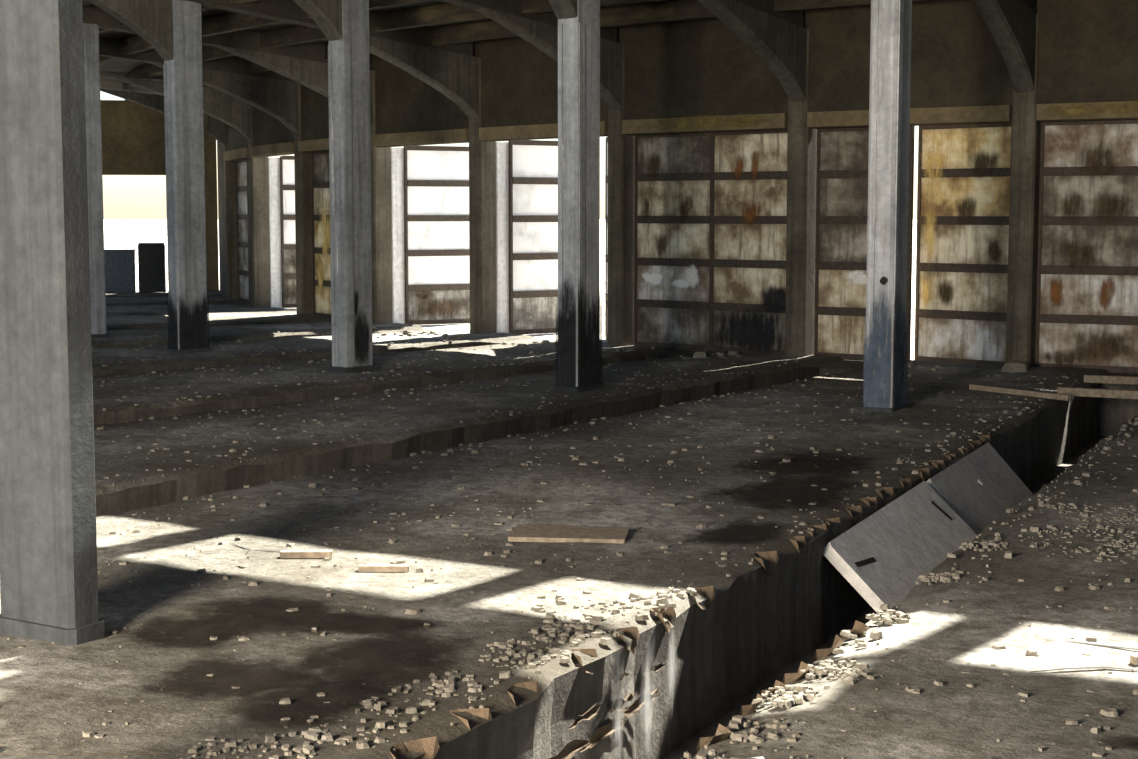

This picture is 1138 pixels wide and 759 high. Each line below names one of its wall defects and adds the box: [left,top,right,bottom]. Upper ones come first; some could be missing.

rust [925,209,935,257]
water stain [643,266,698,288]
water stain [167,295,210,350]
water stain [555,282,602,387]
water stain [715,286,786,352]
spalling [390,383,1138,759]
water stain [118,597,462,728]